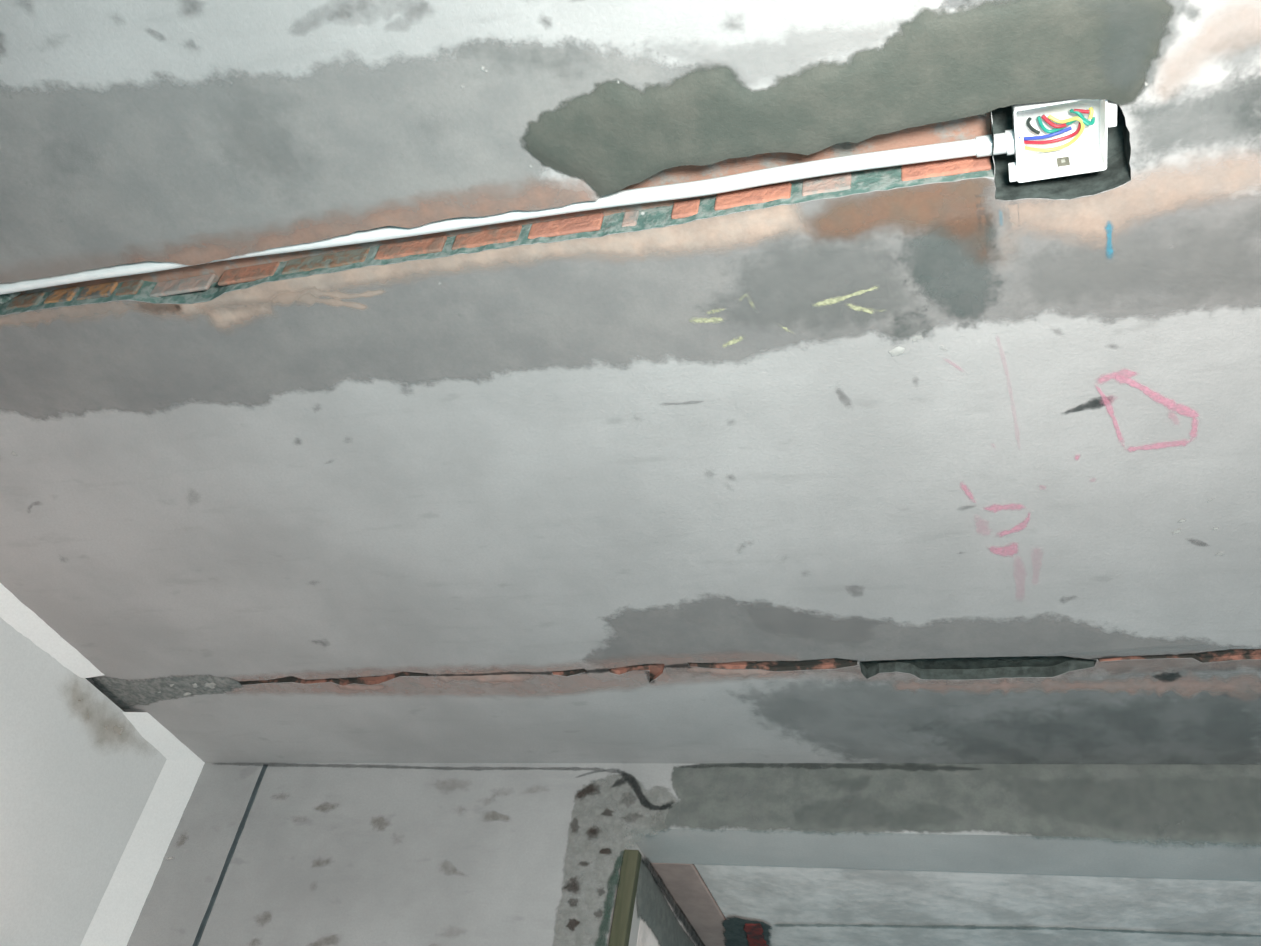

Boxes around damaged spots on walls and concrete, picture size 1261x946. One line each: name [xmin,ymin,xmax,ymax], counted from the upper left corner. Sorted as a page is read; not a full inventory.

spalling [992,105,1013,134]
spalling [1107,104,1124,158]
damp [0,39,718,284]
spalling [994,154,1015,172]
rust [815,179,988,236]
damp [0,161,1261,420]
spalling [92,675,242,711]
crack [238,656,1116,682]
damp [307,597,1261,696]
crack [1148,649,1261,658]
damp [652,763,1261,846]
spalling [553,775,676,946]